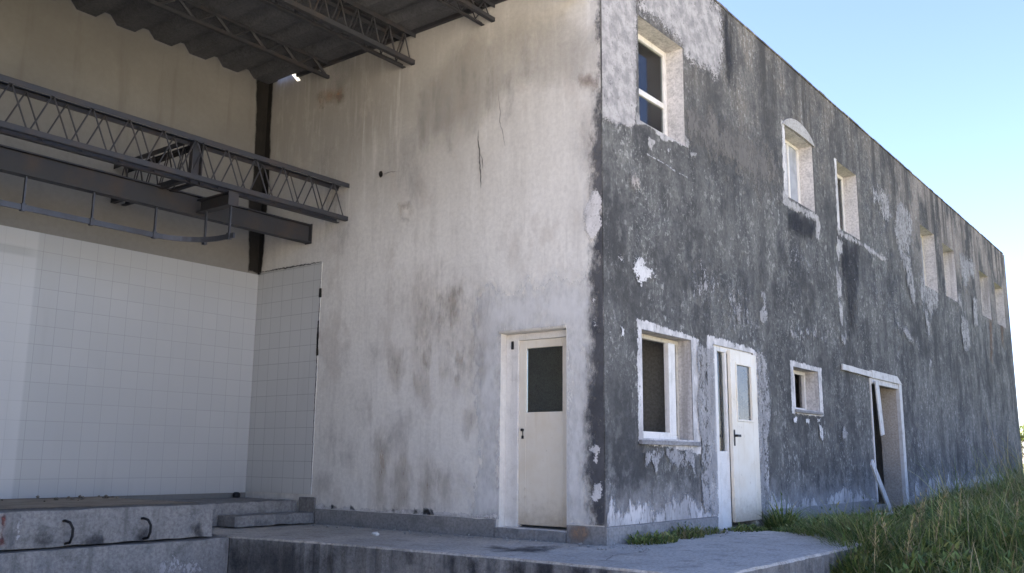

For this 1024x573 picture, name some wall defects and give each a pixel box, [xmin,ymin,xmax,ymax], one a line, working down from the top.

crack [478,94,505,182]
peeling [583,187,602,240]
water stain [789,215,813,237]
spalling [618,256,656,287]
water stain [584,90,718,527]
water stain [836,240,858,326]
water stain [896,253,978,353]
spalling [590,481,602,502]
water stain [768,486,876,510]
water stain [913,472,1003,496]